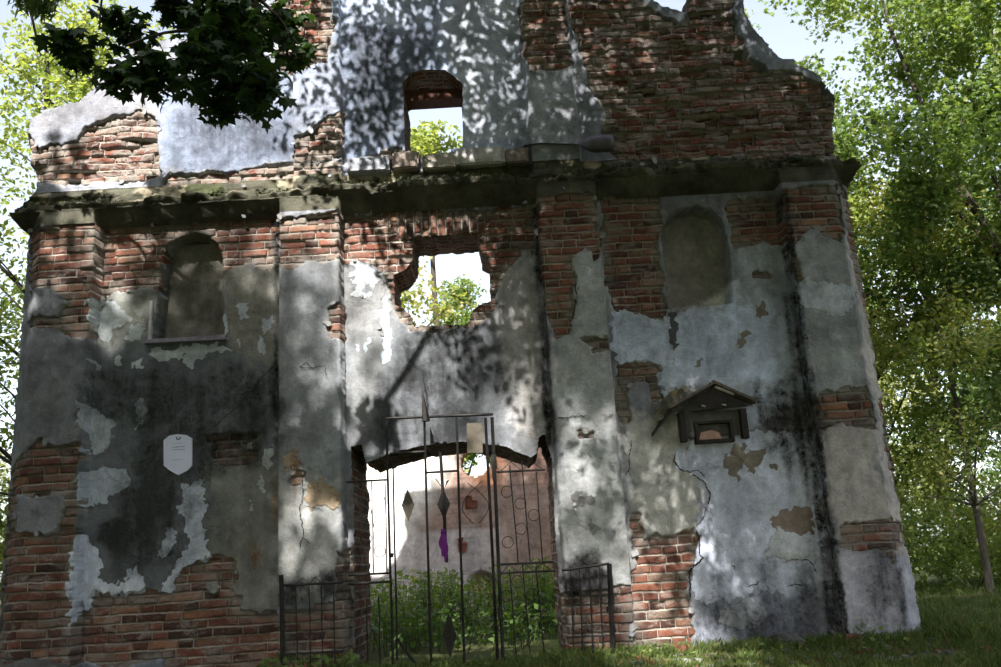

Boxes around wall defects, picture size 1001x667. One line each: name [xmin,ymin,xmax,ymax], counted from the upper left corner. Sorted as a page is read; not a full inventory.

flaking render [30,109,346,188]
flaking render [518,0,840,166]
water stain [75,221,280,565]
flaking render [0,397,356,667]
crack [299,468,322,549]
peeling [27,183,878,425]
spalling [465,495,477,509]
crack [673,451,711,599]
peeling [560,385,905,656]
water stain [695,195,868,643]